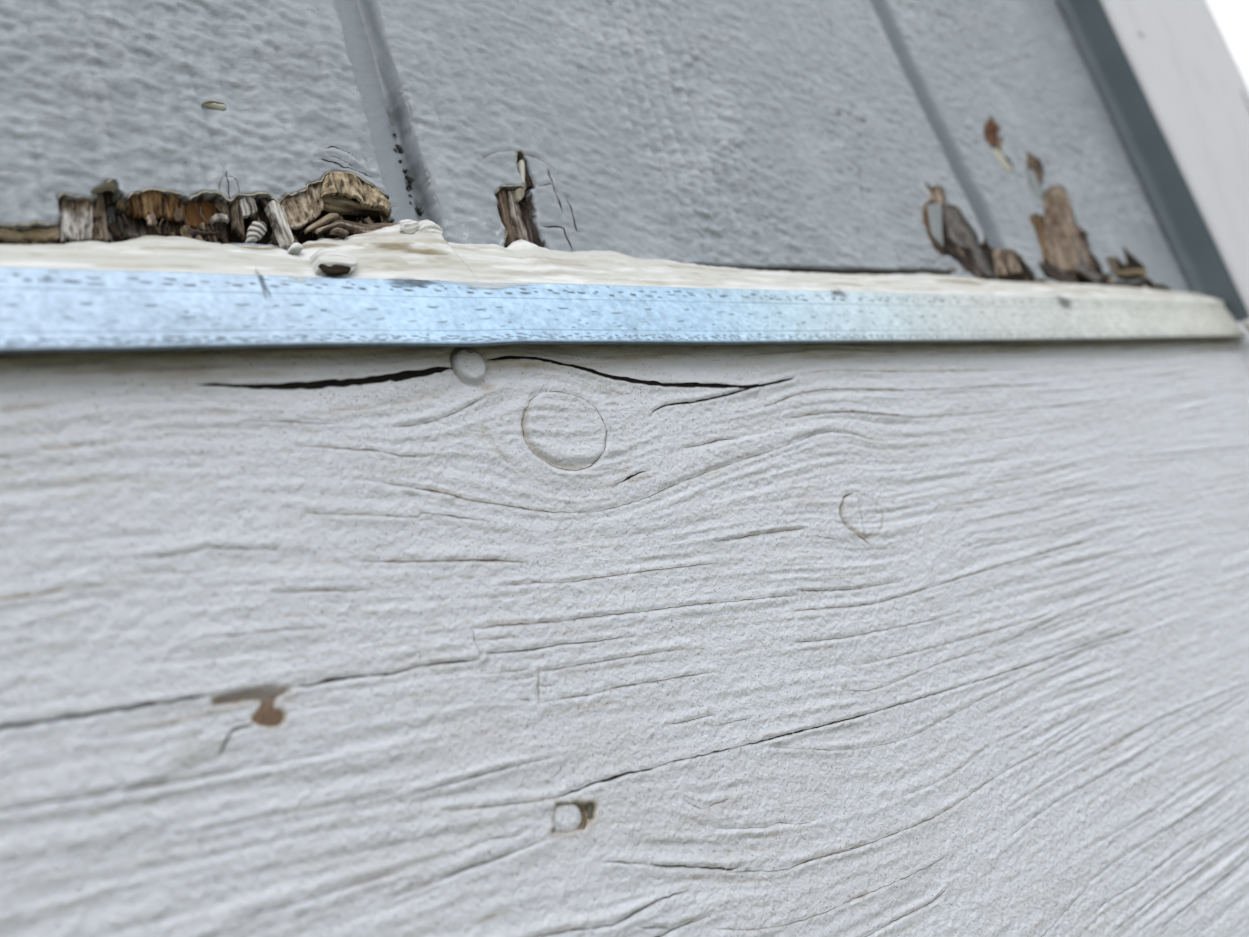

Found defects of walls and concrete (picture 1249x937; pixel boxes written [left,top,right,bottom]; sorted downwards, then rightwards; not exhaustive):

peeling [90,182,116,194]
peeling [514,160,525,202]
peeling [983,116,1054,200]
peeling [927,203,943,248]
crack [196,367,452,389]
crack [248,348,1126,520]
crack [275,493,883,593]
crack [0,694,211,739]
peeling [214,689,287,756]
crack [207,543,1132,923]
crack [0,749,340,812]
crack [535,683,1249,937]